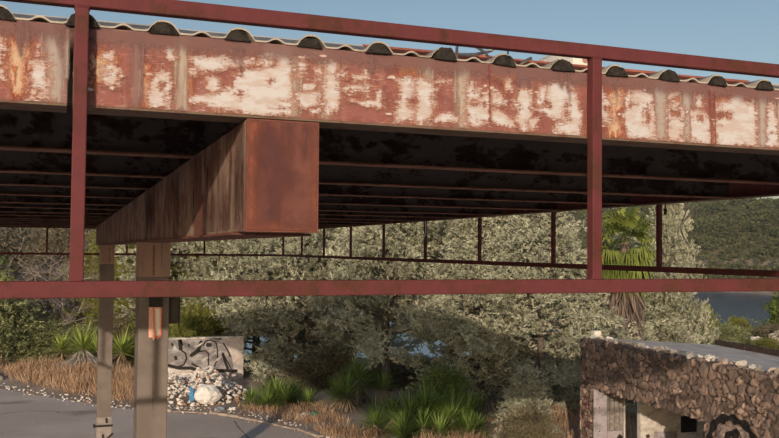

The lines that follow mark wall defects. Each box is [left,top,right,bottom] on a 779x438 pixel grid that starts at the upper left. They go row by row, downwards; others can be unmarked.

peeling [0,33,10,83]
corrosion [1,35,34,100]
corrosion [0,111,55,138]
peeling [21,43,55,101]
peeling [88,49,126,92]
corrosion [88,48,154,108]
corrosion [186,49,195,110]
peeling [144,47,584,136]
corrosion [605,87,626,139]
peeling [602,85,779,147]
corrosion [207,120,326,231]